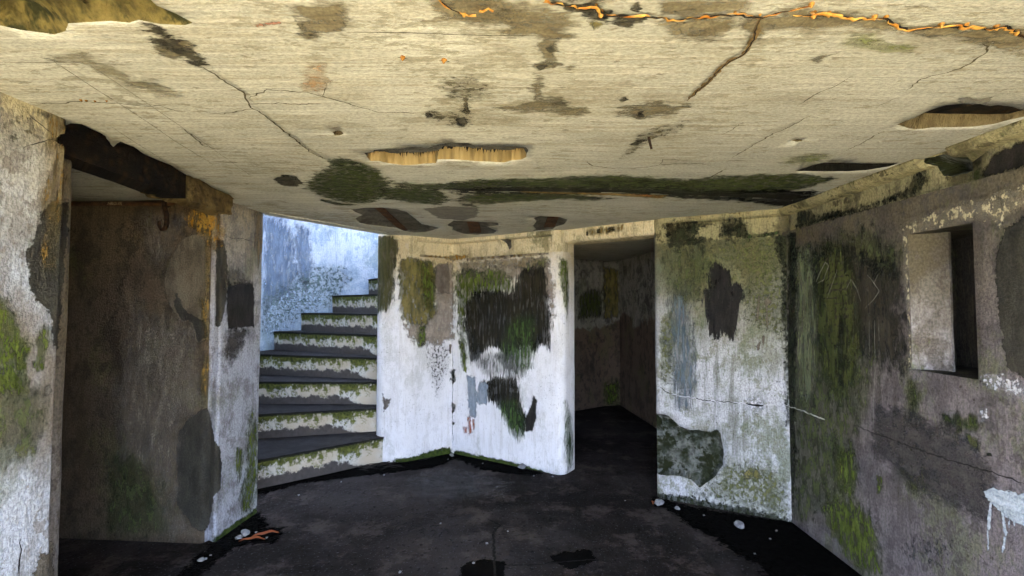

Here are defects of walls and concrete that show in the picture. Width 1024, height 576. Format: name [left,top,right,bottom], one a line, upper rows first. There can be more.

spalling [0,0,192,34]
crack [347,0,533,36]
crack [543,0,1024,149]
crack [7,62,420,187]
spalling [898,104,1024,129]
spalling [365,143,528,165]
spalling [797,163,897,171]
leakage [425,186,816,220]
crack [659,387,825,420]
spalling [656,413,724,487]